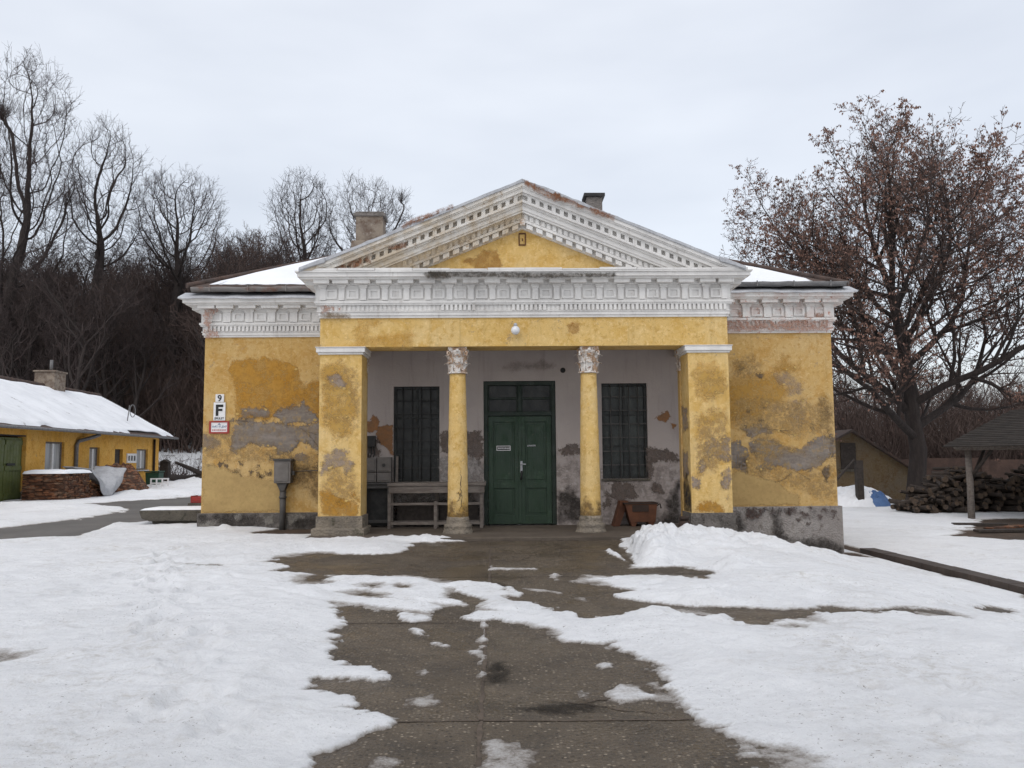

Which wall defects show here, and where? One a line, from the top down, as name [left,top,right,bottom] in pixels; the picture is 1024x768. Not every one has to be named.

peeling [204,356,357,502]
peeling [367,415,393,458]
spalling [467,430,486,482]
spalling [558,443,580,456]
spalling [645,356,837,525]
leakage [558,488,581,521]
leakage [663,475,724,524]